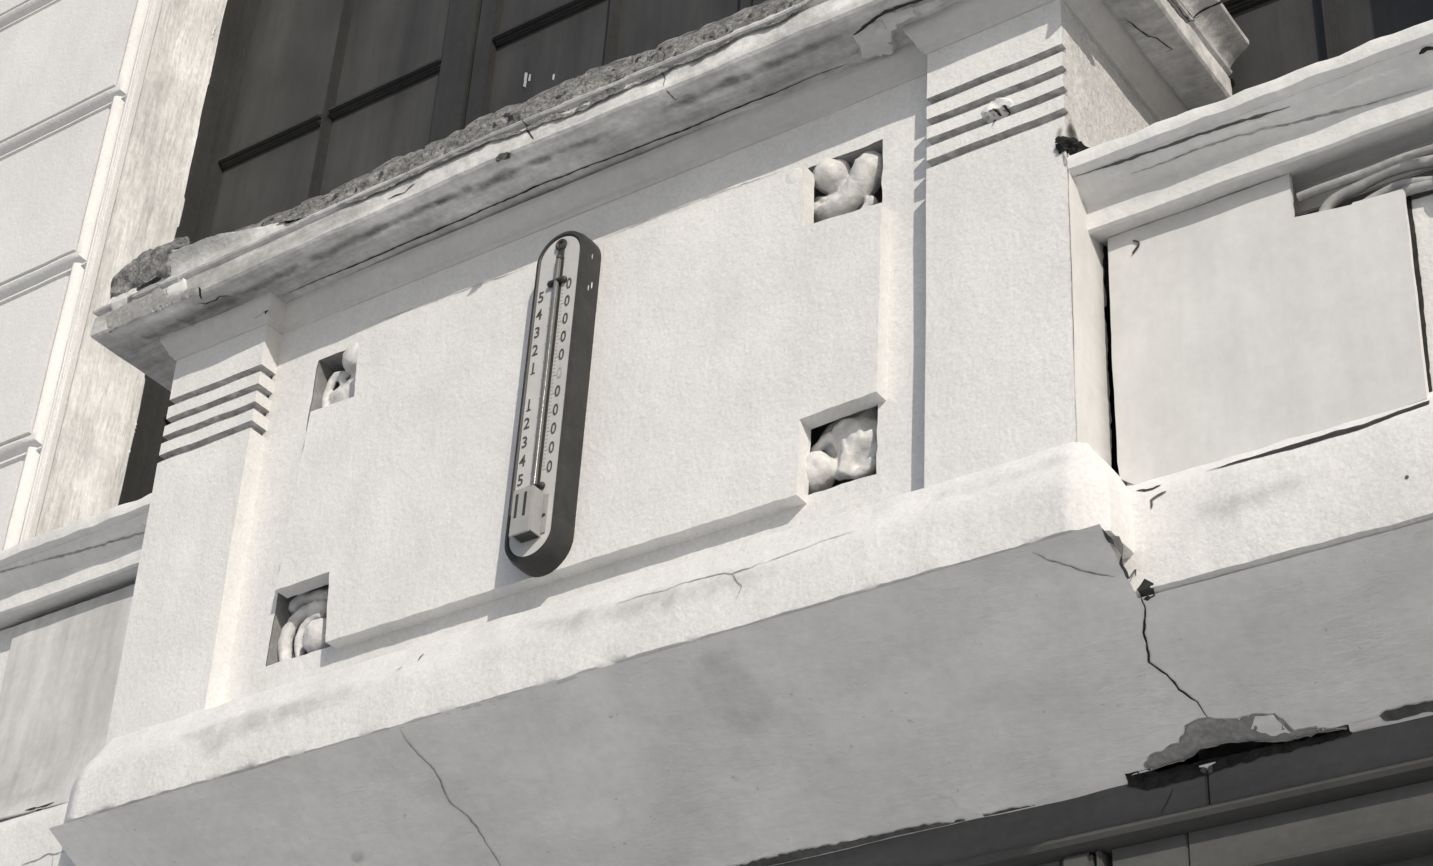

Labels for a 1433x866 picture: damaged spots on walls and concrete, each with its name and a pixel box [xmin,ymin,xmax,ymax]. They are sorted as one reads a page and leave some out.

peeling [853,0,945,59]
crack [1127,21,1173,52]
peeling [1168,0,1195,22]
crack [1193,1,1222,18]
spalling [233,0,811,232]
spalling [981,98,1013,123]
spalling [106,236,213,333]
crack [614,532,849,604]
crack [1032,552,1207,717]
peeling [1380,701,1433,721]
spalling [1125,713,1352,791]
crack [400,730,500,865]